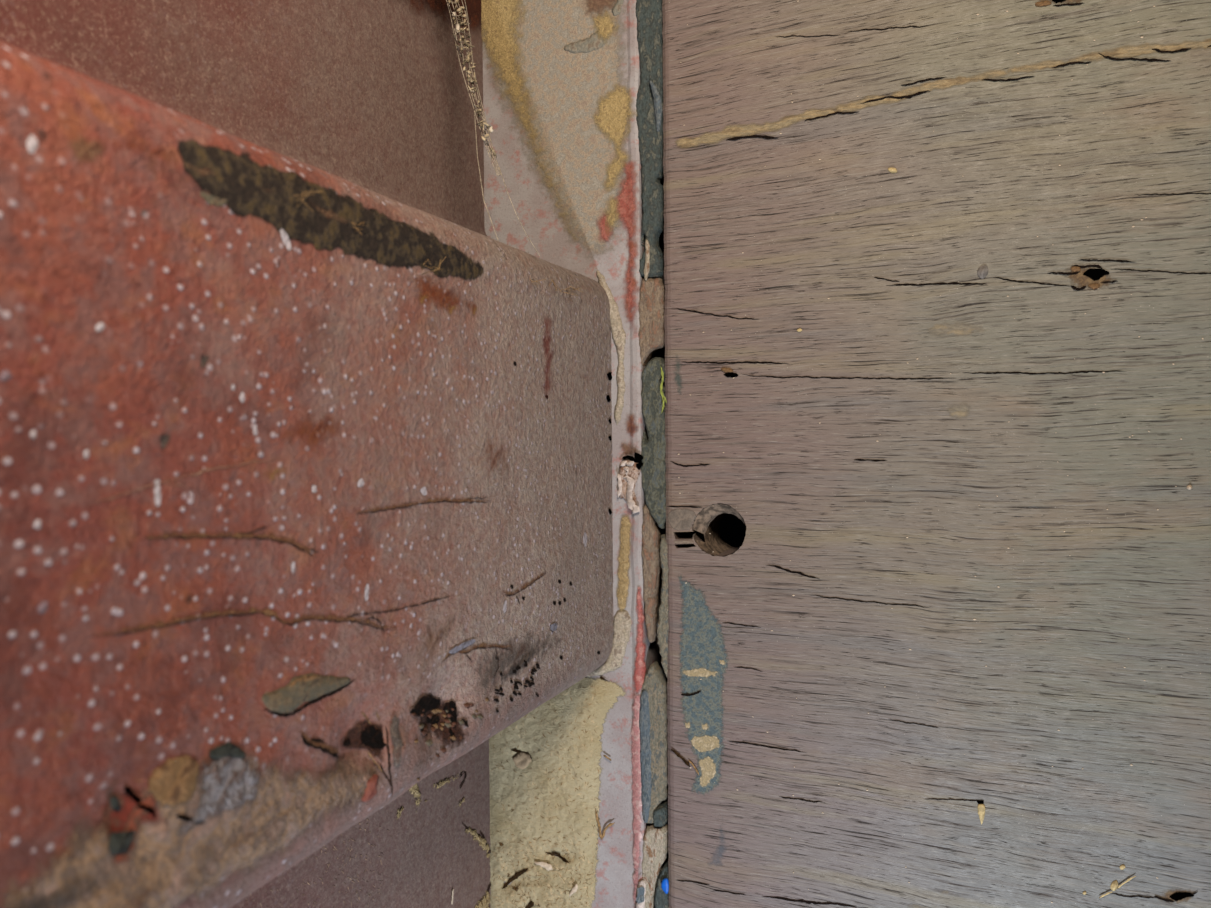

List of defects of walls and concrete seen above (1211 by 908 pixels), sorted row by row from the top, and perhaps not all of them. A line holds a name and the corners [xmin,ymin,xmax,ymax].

peeling [564,31,609,53]
crack [775,26,925,37]
crack [358,497,491,514]
crack [142,526,319,557]
crack [504,571,547,604]
crack [92,595,452,638]
peeling [262,673,357,717]
spalling [403,656,541,758]
spalling [343,712,386,773]
spalling [102,755,204,863]